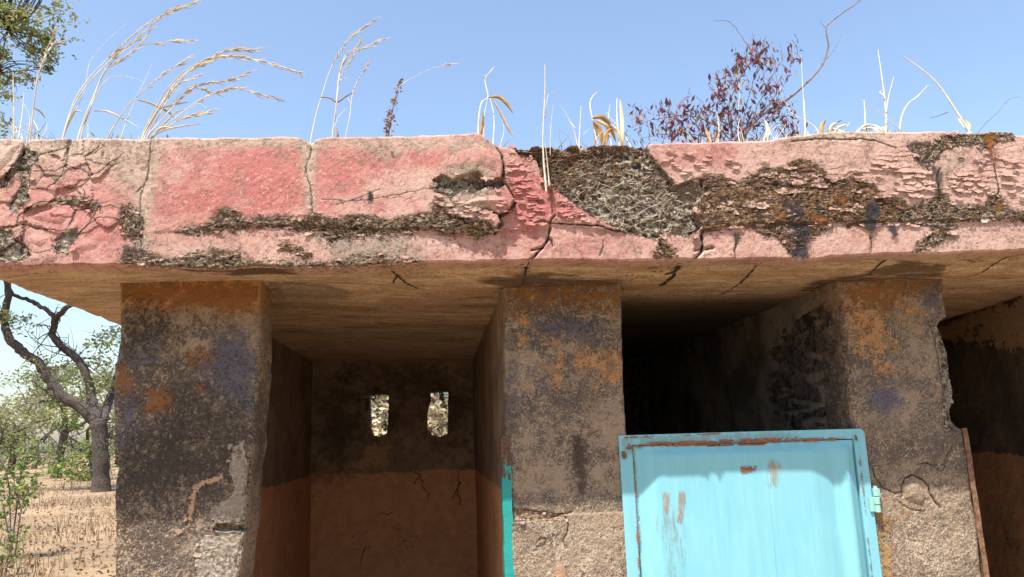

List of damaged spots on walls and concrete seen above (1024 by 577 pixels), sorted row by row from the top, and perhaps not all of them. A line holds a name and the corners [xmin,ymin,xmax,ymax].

crack [1,144,151,253]
crack [305,144,432,212]
spalling [117,130,1024,268]
crack [380,266,418,289]
crack [659,233,775,295]
spalling [174,441,249,577]
corrosion [613,433,858,577]
crack [872,463,939,511]